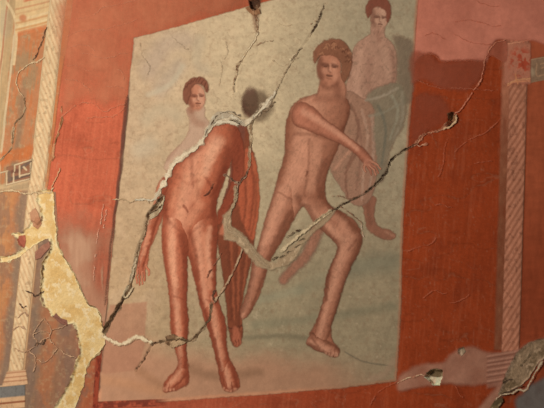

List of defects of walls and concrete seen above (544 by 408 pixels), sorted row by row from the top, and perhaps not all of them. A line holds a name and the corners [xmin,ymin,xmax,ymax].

crack [0,27,47,160]
leakage [245,94,269,118]
crack [205,3,325,201]
crack [318,39,506,224]
crack [13,291,76,372]
flaking render [0,189,105,408]
crack [102,196,163,334]
crack [136,249,243,371]
spalling [398,368,443,386]
flaking render [490,339,544,408]